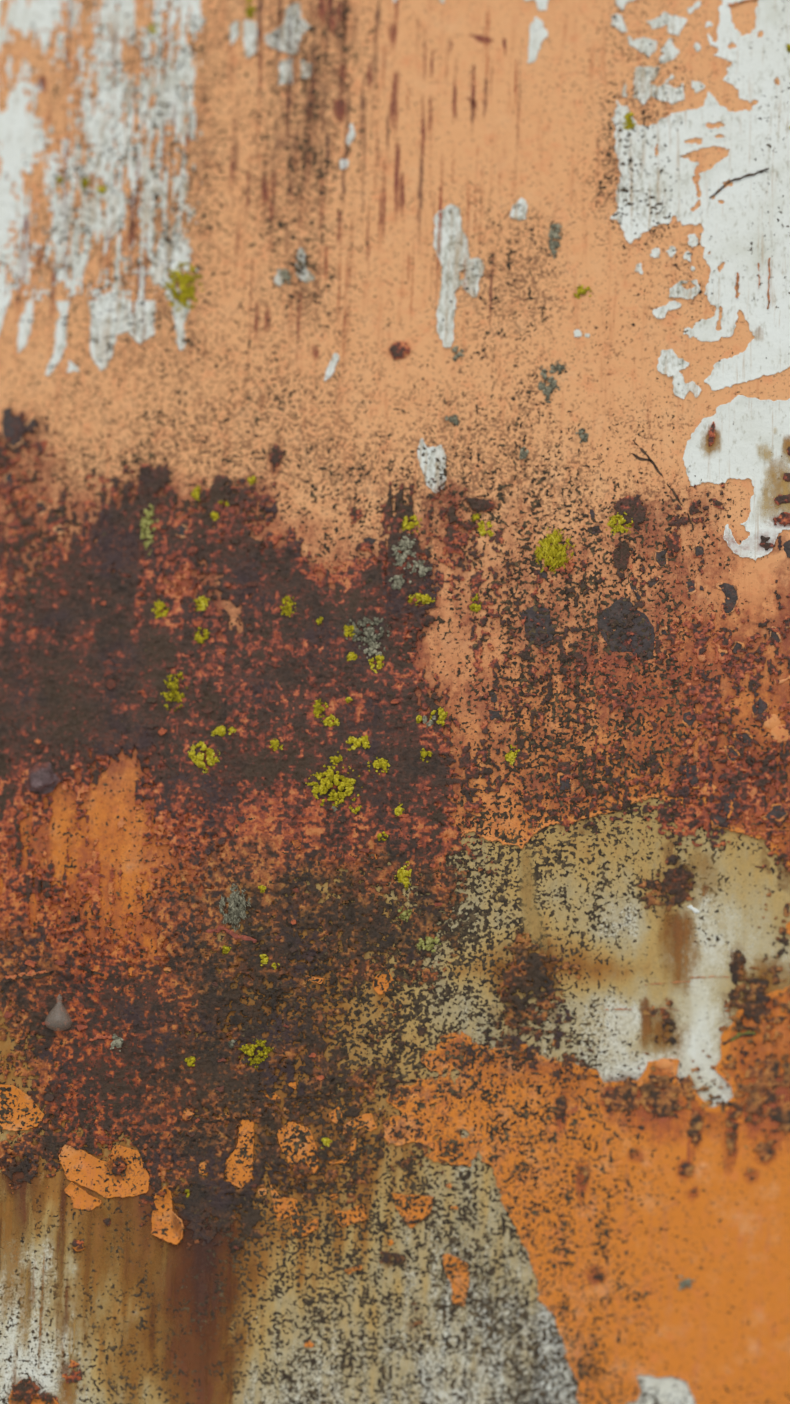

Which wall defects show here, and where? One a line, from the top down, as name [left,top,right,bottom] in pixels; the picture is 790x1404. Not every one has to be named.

peeling [0,0,205,376]
rust [389,341,410,360]
peeling [433,204,485,348]
peeling [610,0,790,561]
peeling [0,1084,44,1131]
rust [0,406,790,1404]
peeling [435,840,500,983]
peeling [432,876,790,1108]
peeling [0,1144,184,1404]
peeling [238,1159,578,1404]
peeling [626,1375,695,1404]